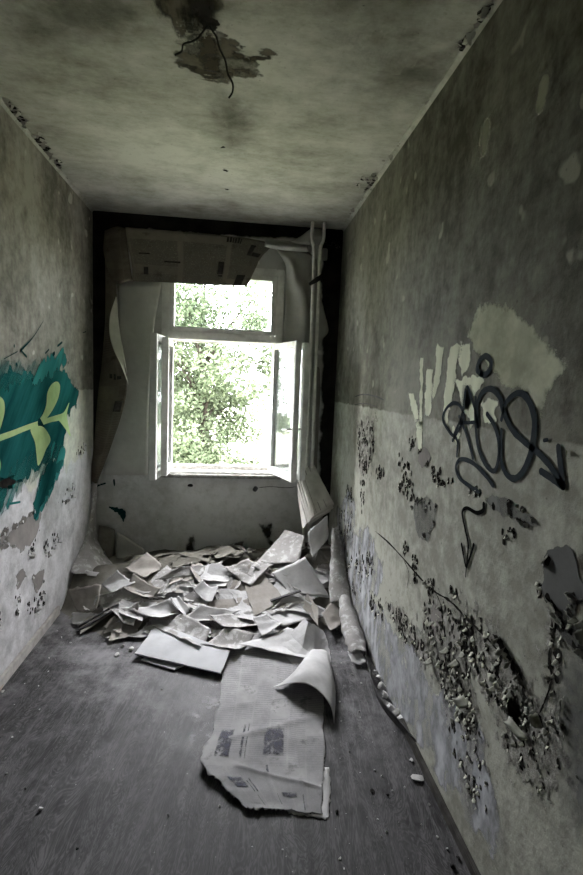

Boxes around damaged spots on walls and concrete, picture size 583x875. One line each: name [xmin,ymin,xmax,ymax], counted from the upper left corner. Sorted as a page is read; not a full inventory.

damp [156,0,277,84]
flaking render [457,3,495,52]
peeling [76,211,343,495]
flaking render [0,509,62,559]
flaking render [15,568,46,616]
flaking render [322,410,583,859]